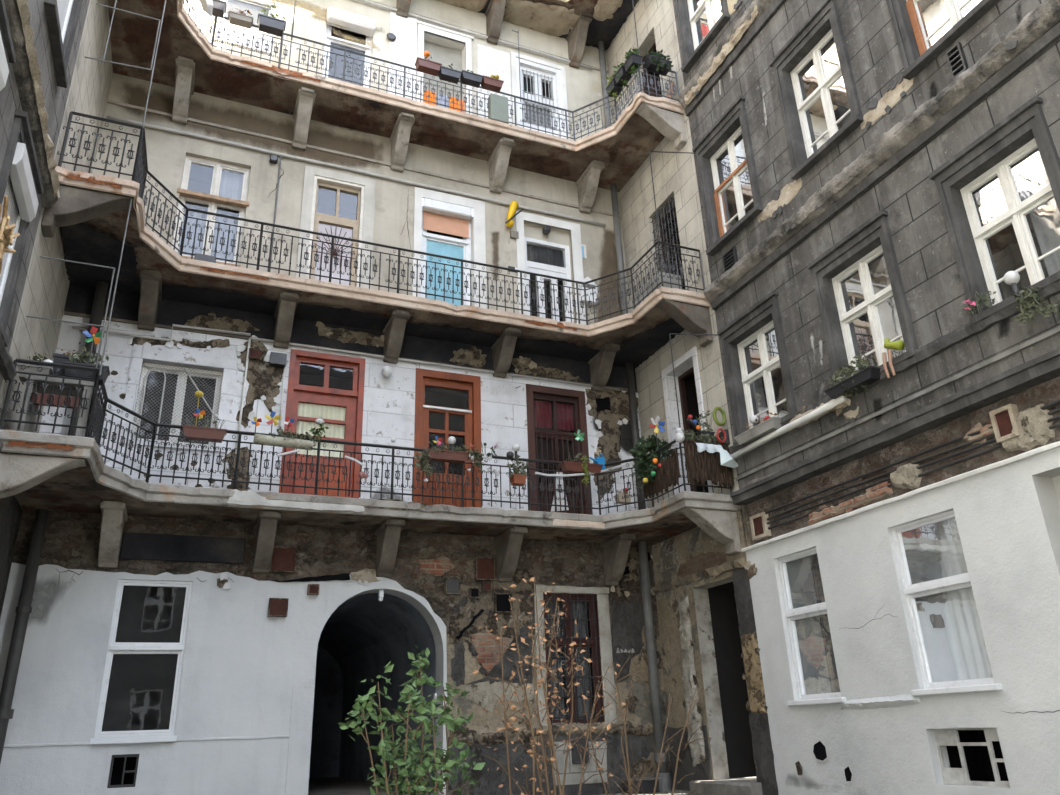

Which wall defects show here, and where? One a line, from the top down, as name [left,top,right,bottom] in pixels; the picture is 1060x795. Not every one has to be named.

peeling [988,0,1058,68]
peeling [757,71,934,232]
peeling [127,311,284,428]
peeling [514,356,639,500]
peeling [808,481,893,526]
peeling [411,547,535,712]
peeling [610,547,656,598]